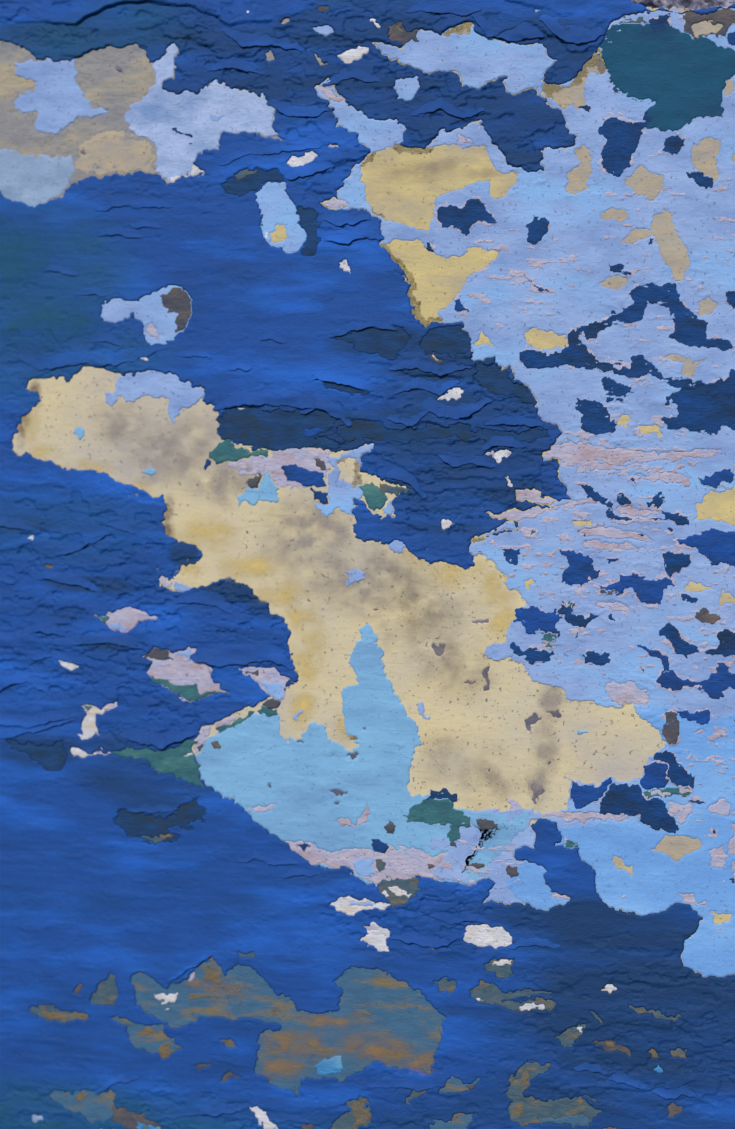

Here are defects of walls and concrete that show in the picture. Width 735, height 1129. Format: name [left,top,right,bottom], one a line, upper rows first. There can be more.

peeling [221,17,328,66]
peeling [0,41,329,207]
peeling [222,151,335,256]
peeling [17,285,192,371]
peeling [309,1,735,979]
peeling [0,650,79,697]
peeling [12,366,666,916]
peeling [0,710,78,771]
peeling [434,977,456,993]
peeling [574,1062,698,1099]